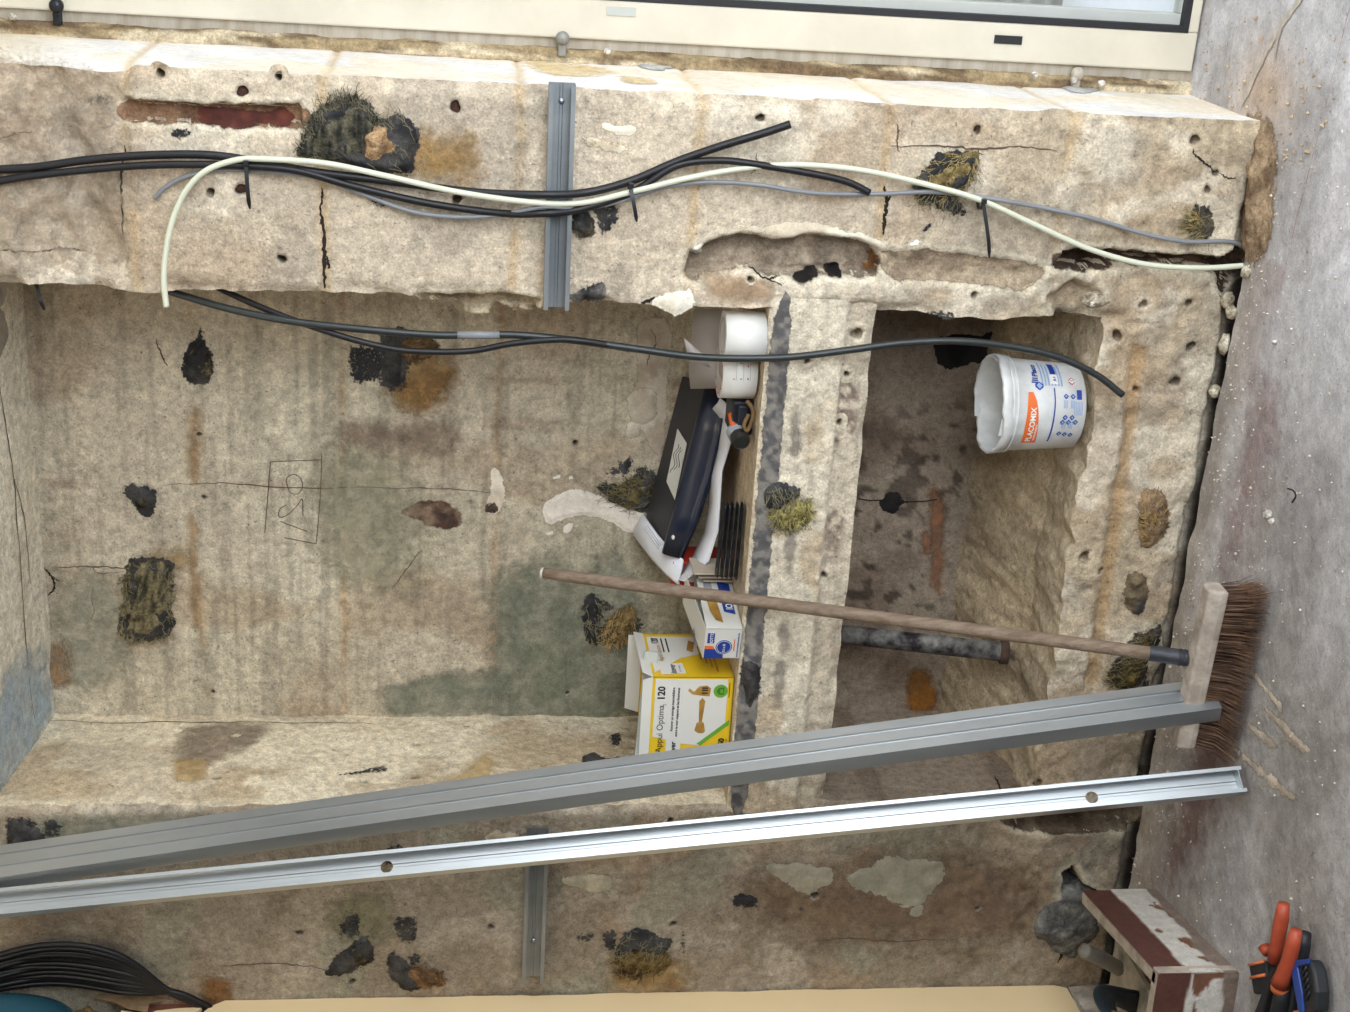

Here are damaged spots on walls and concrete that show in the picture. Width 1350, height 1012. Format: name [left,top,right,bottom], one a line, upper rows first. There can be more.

crack [319,188,330,288]
spalling [625,221,1244,454]
peeling [765,855,946,917]